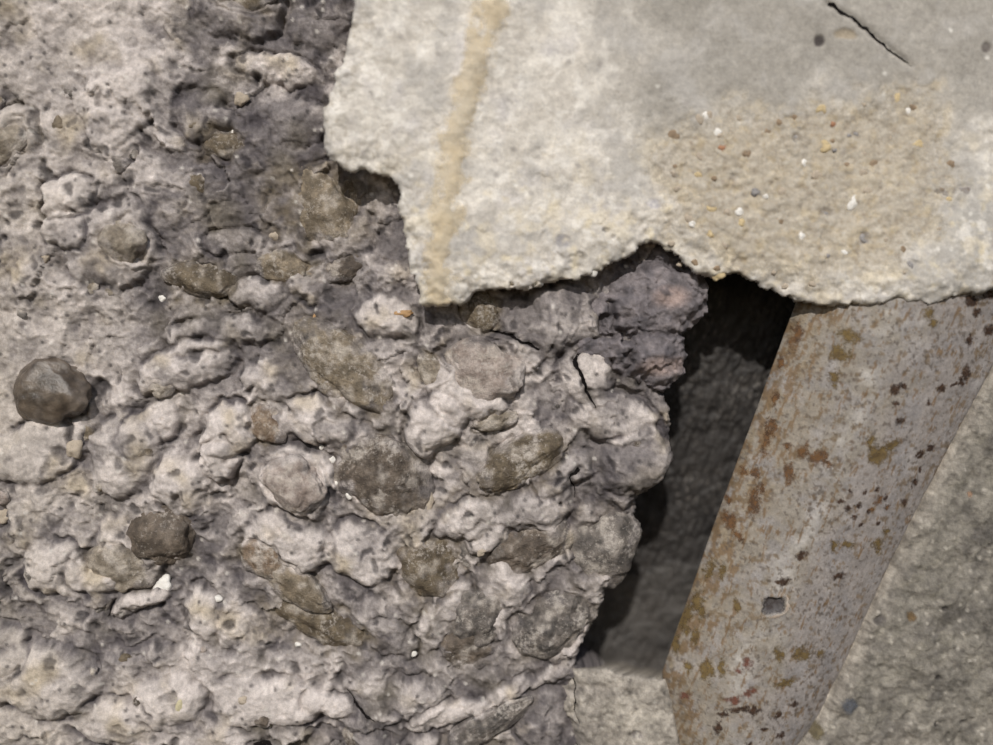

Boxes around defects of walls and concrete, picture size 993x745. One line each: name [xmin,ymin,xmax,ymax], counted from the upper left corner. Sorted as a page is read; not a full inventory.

crack [827,2,911,66]
spalling [894,93,917,115]
spalling [695,111,727,151]
spalling [846,187,873,211]
spalling [712,266,726,282]
rust [965,290,993,318]
spalling [0,0,675,745]
rust [890,383,907,425]
rust [784,442,833,484]
rust [838,487,890,527]
rust [684,657,750,679]
rust [713,689,762,734]